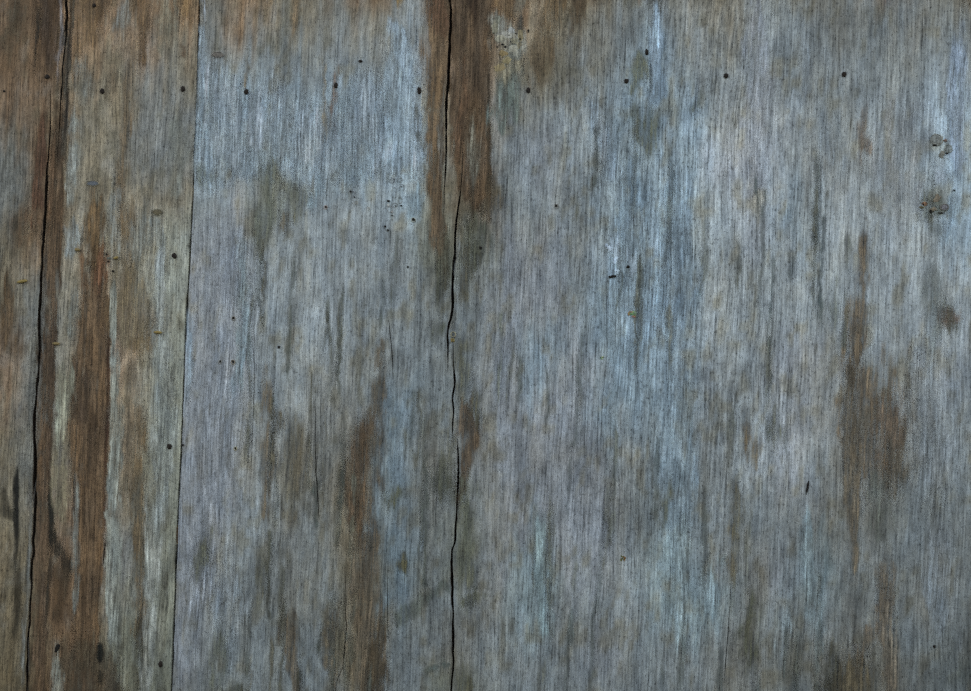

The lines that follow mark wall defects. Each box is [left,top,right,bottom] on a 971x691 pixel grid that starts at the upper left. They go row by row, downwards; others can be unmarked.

crack [22,0,69,691]
crack [436,0,463,691]